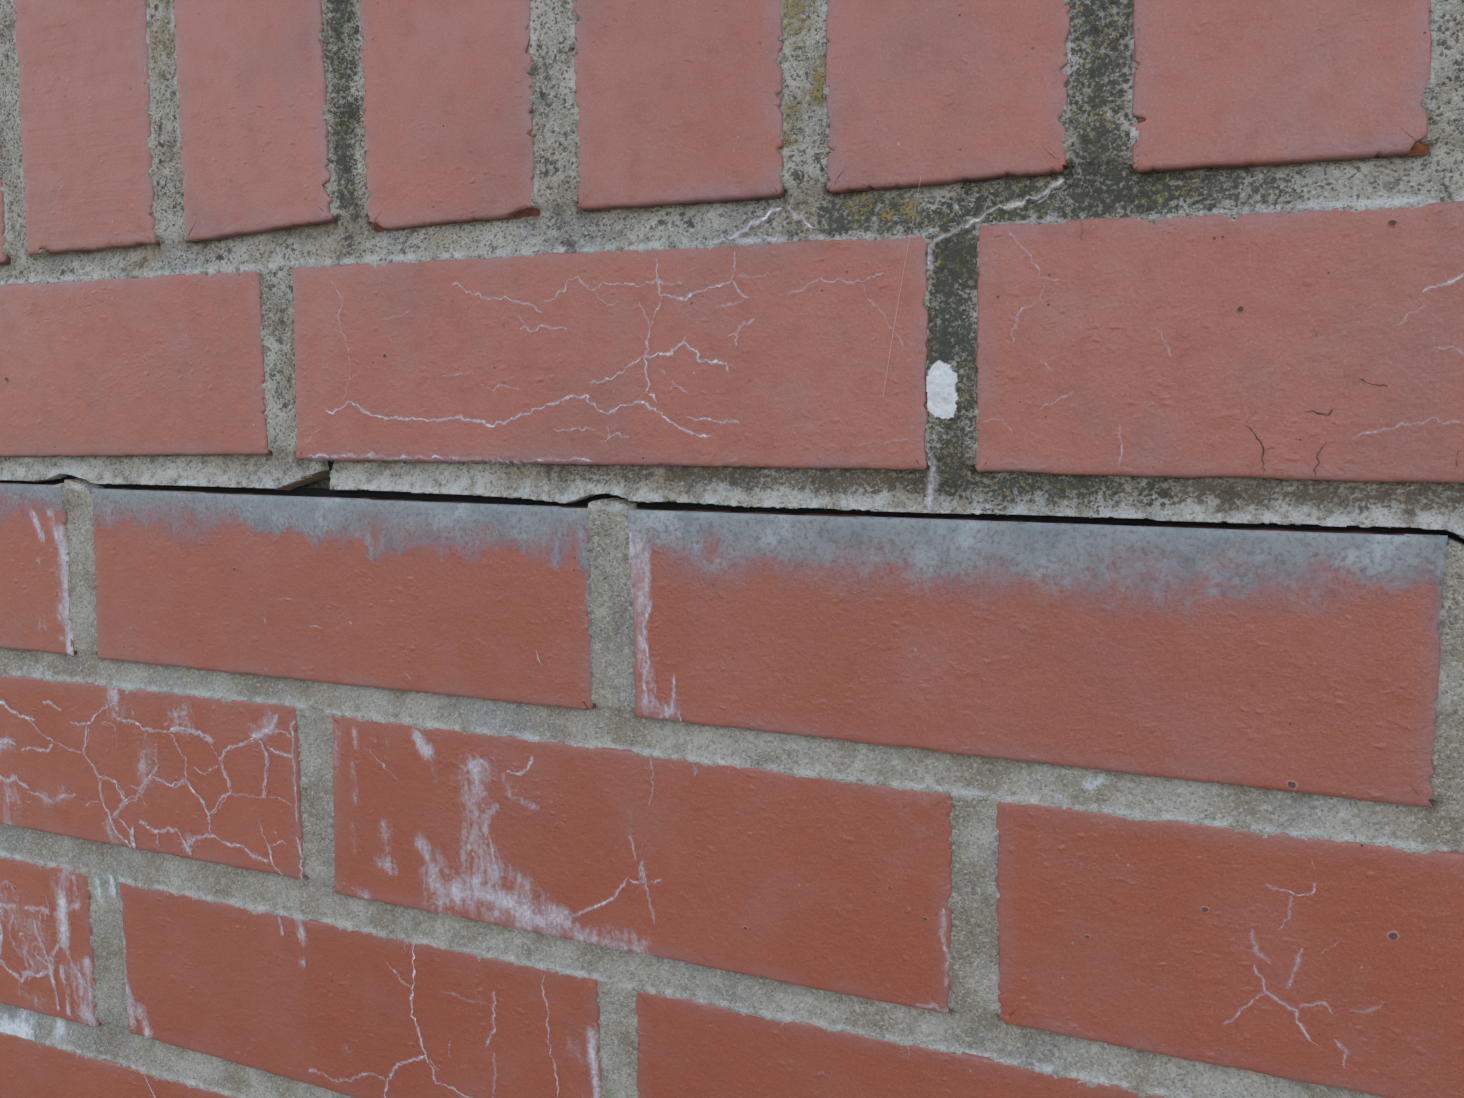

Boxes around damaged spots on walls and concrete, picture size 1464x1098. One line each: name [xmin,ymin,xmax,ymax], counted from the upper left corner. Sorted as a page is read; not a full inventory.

crack [327,282,739,438]
leakage [0,483,74,656]
leakage [92,488,591,605]
crack [0,460,1464,544]
leakage [539,455,1464,608]
crack [74,698,303,879]
leakage [413,731,433,757]
crack [0,904,46,981]
leakage [418,841,597,942]
crack [384,950,467,1098]